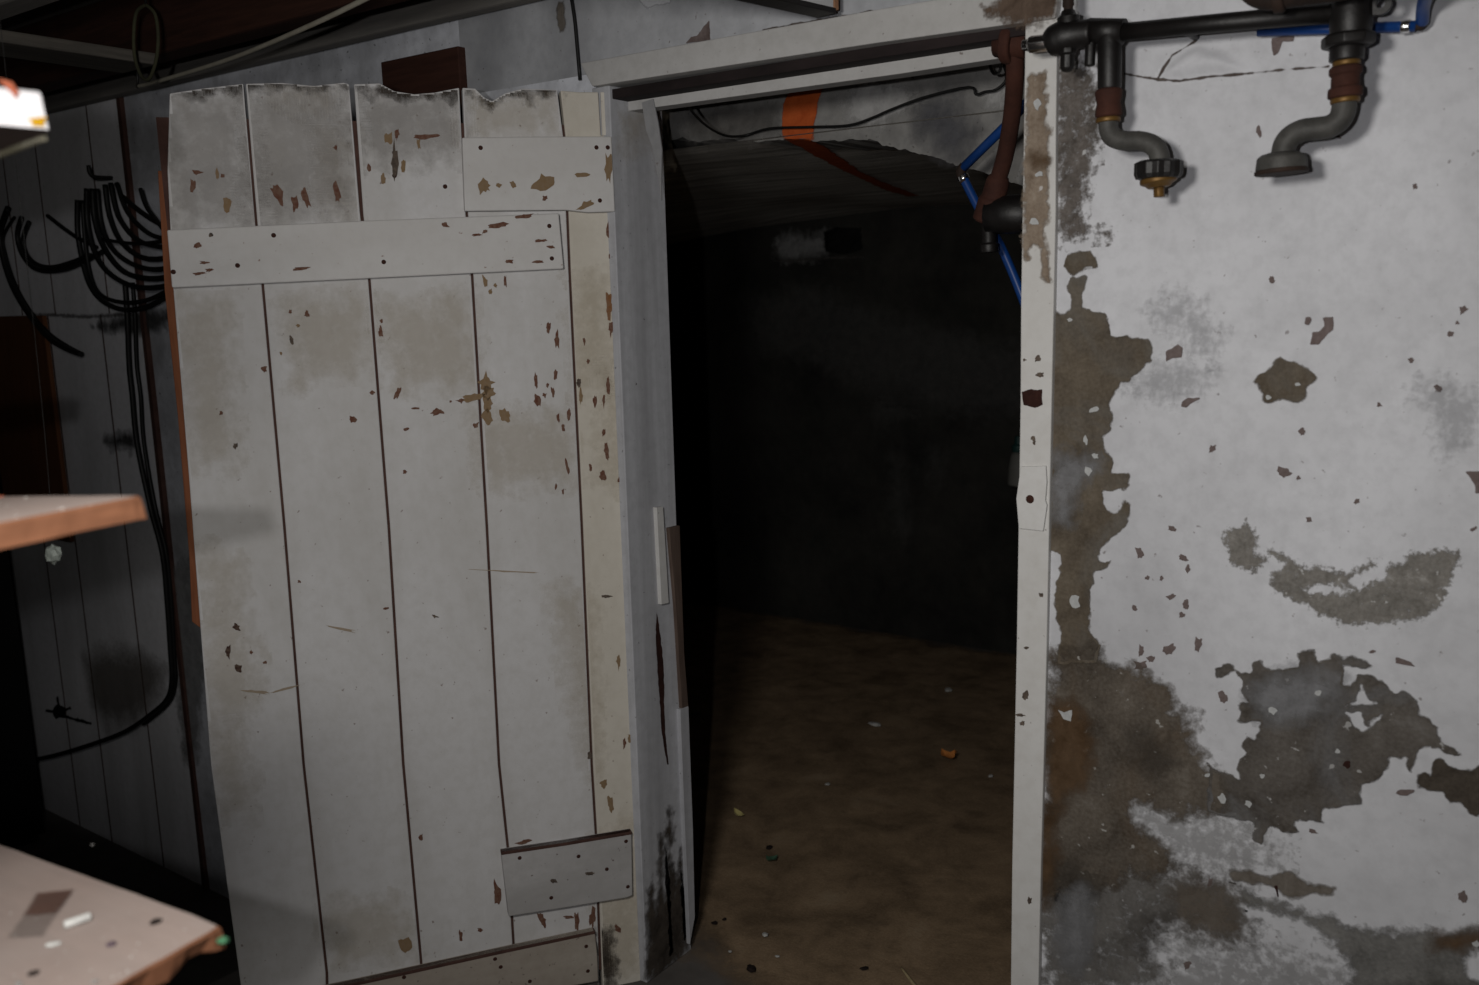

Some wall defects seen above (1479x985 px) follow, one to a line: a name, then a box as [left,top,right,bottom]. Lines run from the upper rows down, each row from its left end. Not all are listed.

peeling [1023,251,1189,665]
spalling [1254,357,1316,403]
peeling [1222,518,1460,626]
peeling [1466,471,1479,493]
damp [1041,641,1479,985]
peeling [1207,649,1479,844]